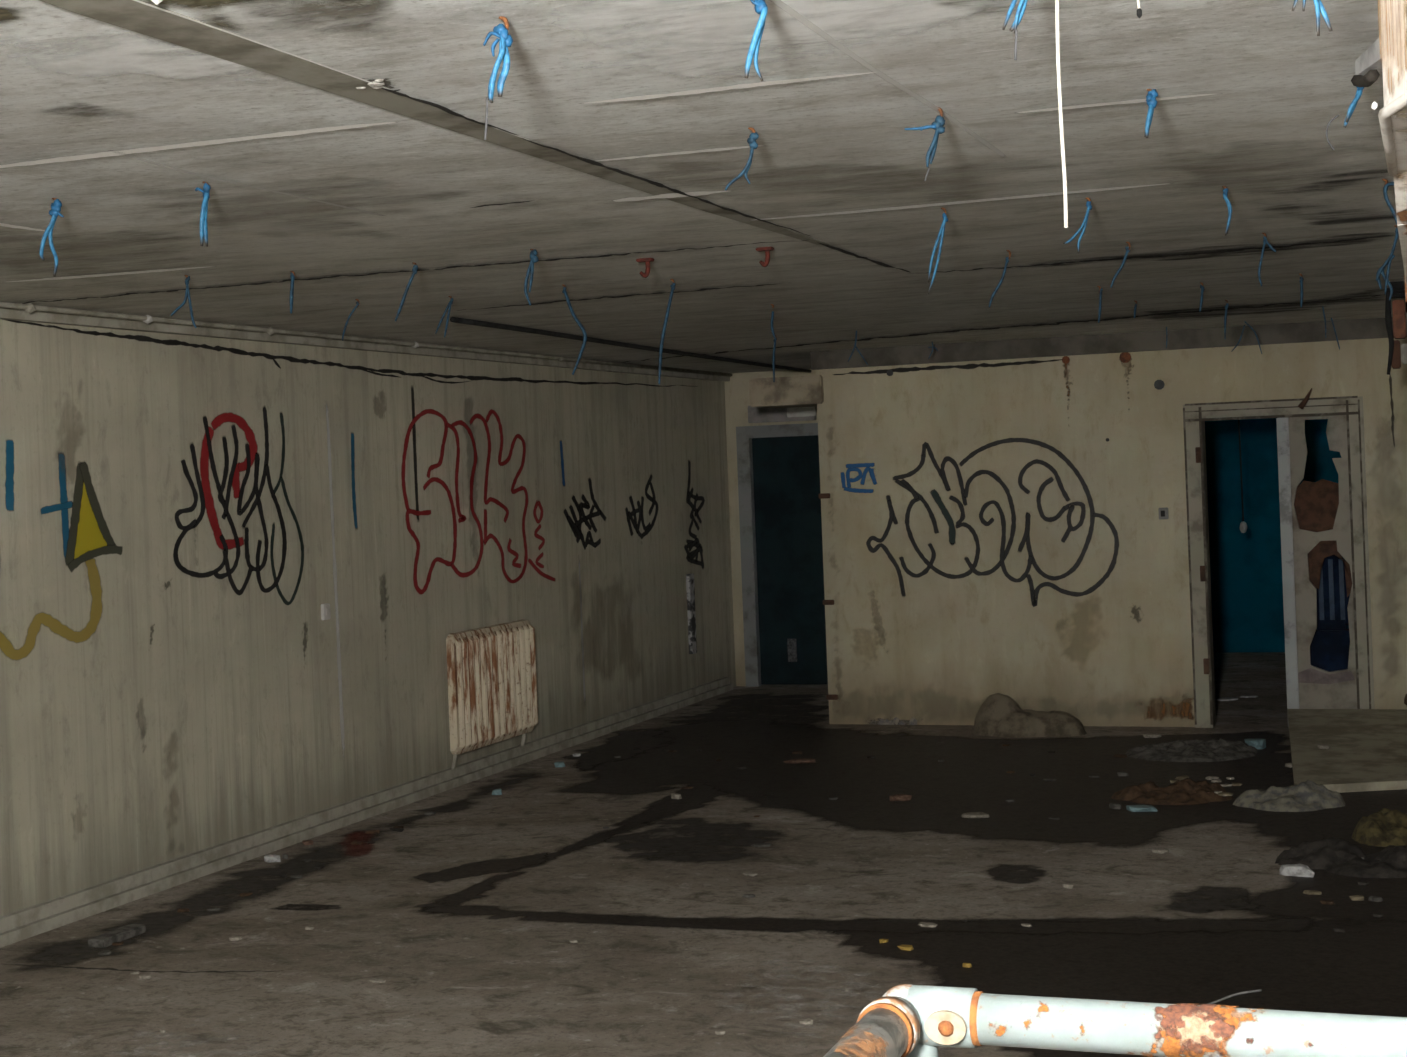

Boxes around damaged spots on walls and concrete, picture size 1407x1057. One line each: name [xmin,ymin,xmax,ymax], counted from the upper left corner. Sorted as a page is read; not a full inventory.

damp [0,7,19,23]
damp [146,0,385,30]
damp [562,0,1002,76]
corrosion [1378,0,1407,93]